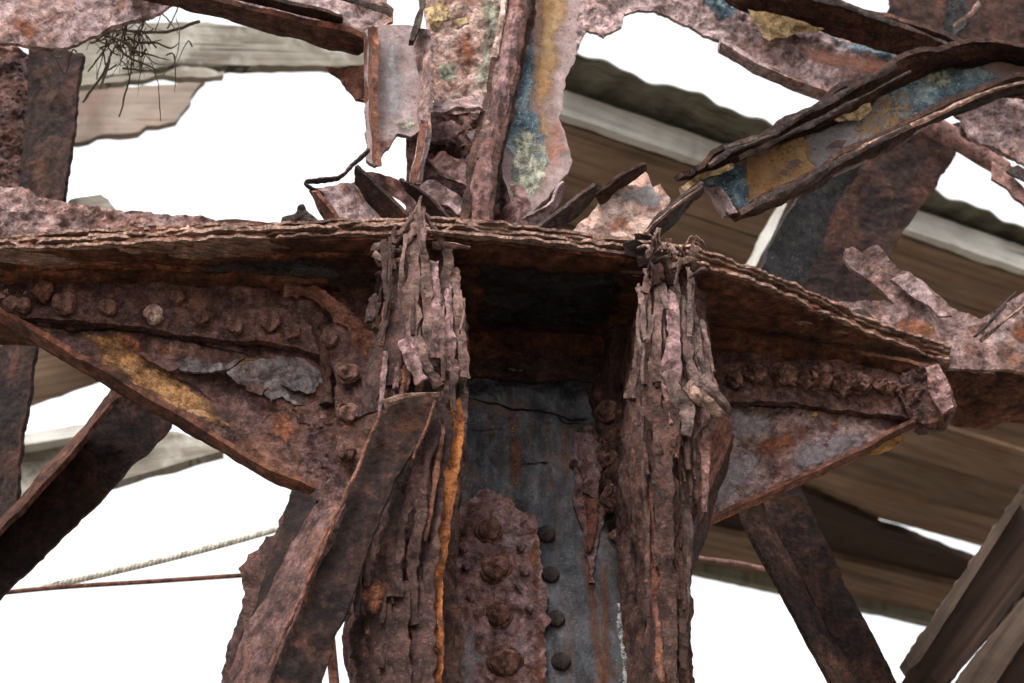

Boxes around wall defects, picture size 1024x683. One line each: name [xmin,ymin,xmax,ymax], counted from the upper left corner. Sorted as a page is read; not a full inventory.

peeling [506,34,549,205]
peeling [702,136,815,207]
peeling [835,103,872,122]
peeling [890,67,998,120]
corrosion [85,333,330,441]
corrosion [349,120,475,683]
crack [470,398,592,431]
corrosion [612,217,731,683]
corrosion [572,425,606,584]